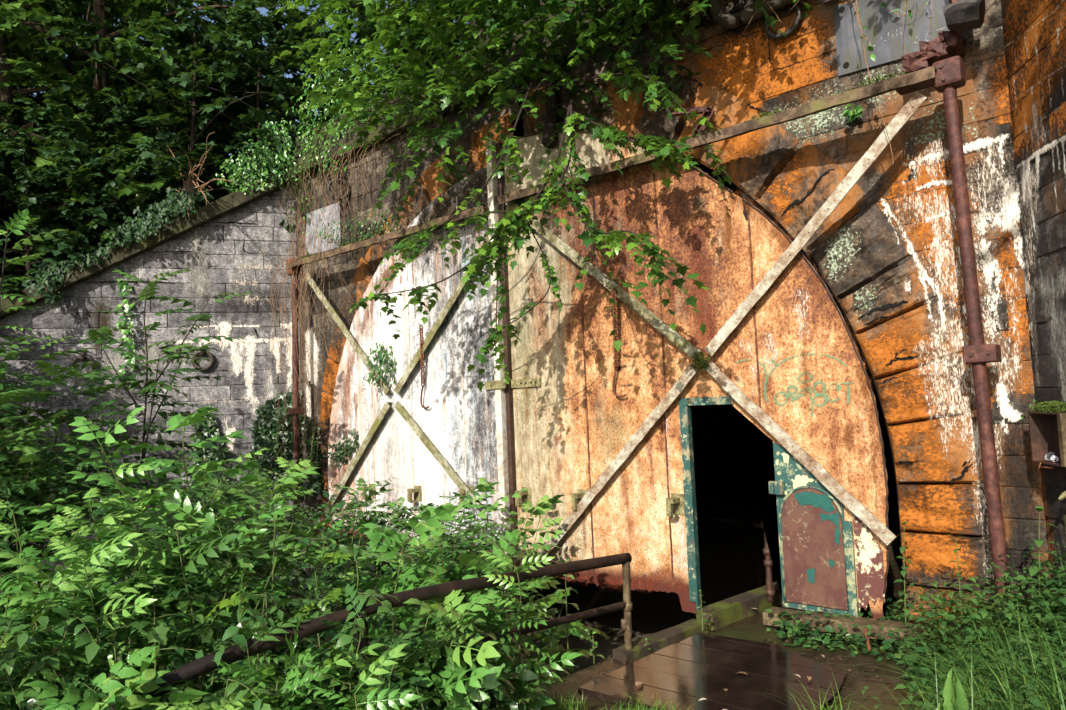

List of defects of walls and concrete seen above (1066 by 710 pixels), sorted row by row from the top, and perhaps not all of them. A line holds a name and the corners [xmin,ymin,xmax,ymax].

damp [187,226,211,299]
rust [725,196,850,346]
damp [89,297,165,423]
damp [205,416,237,451]
damp [172,321,292,420]
damp [305,329,320,420]
rust [333,253,421,484]
rust [857,363,880,480]
damp [881,136,994,581]
damp [963,105,1066,591]
peeling [775,452,841,546]
peeling [807,568,816,583]